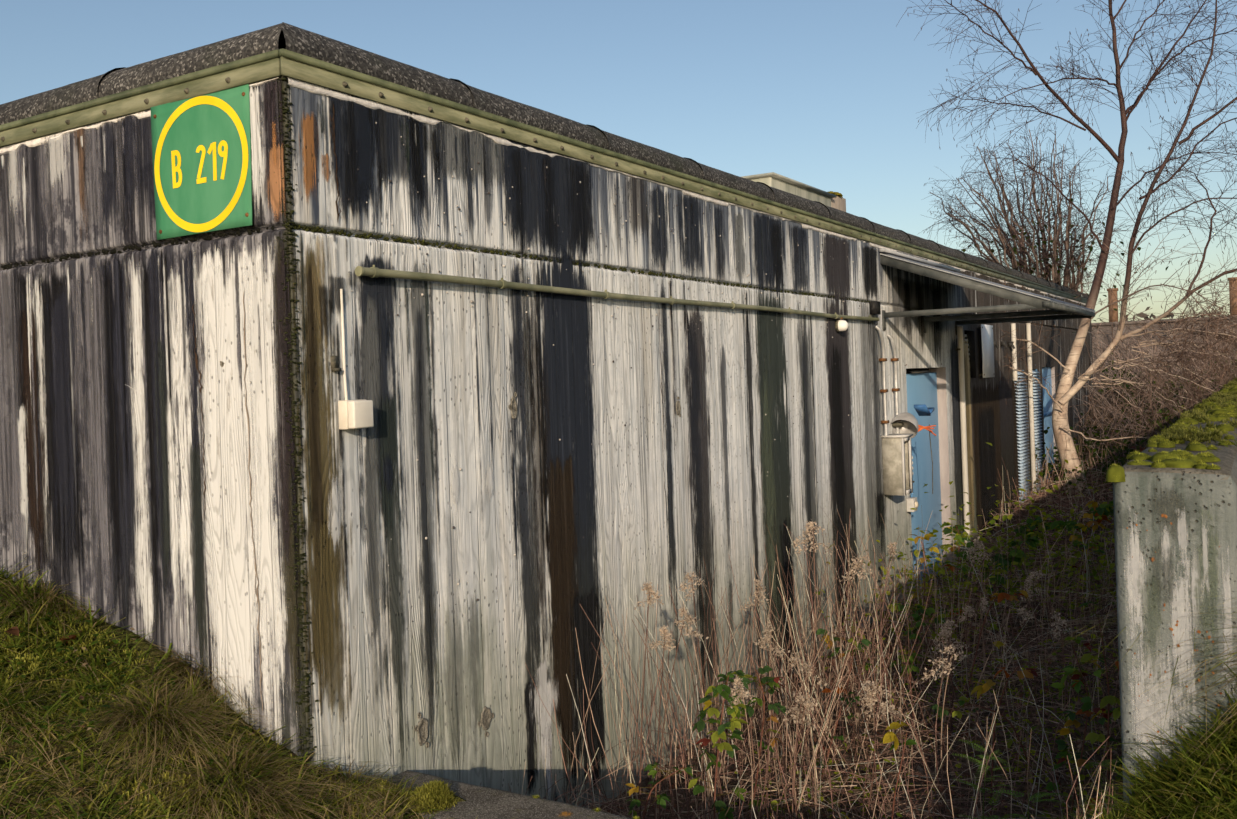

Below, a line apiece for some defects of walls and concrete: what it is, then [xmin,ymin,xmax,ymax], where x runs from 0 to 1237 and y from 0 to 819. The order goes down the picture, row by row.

leakage [99,109,155,232]
rust [262,79,286,215]
rust [299,114,329,200]
leakage [614,176,629,245]
leakage [8,267,85,582]
leakage [96,247,209,676]
leakage [252,87,605,799]
leakage [647,186,879,725]
leakage [868,316,886,552]
leakage [1150,486,1225,675]